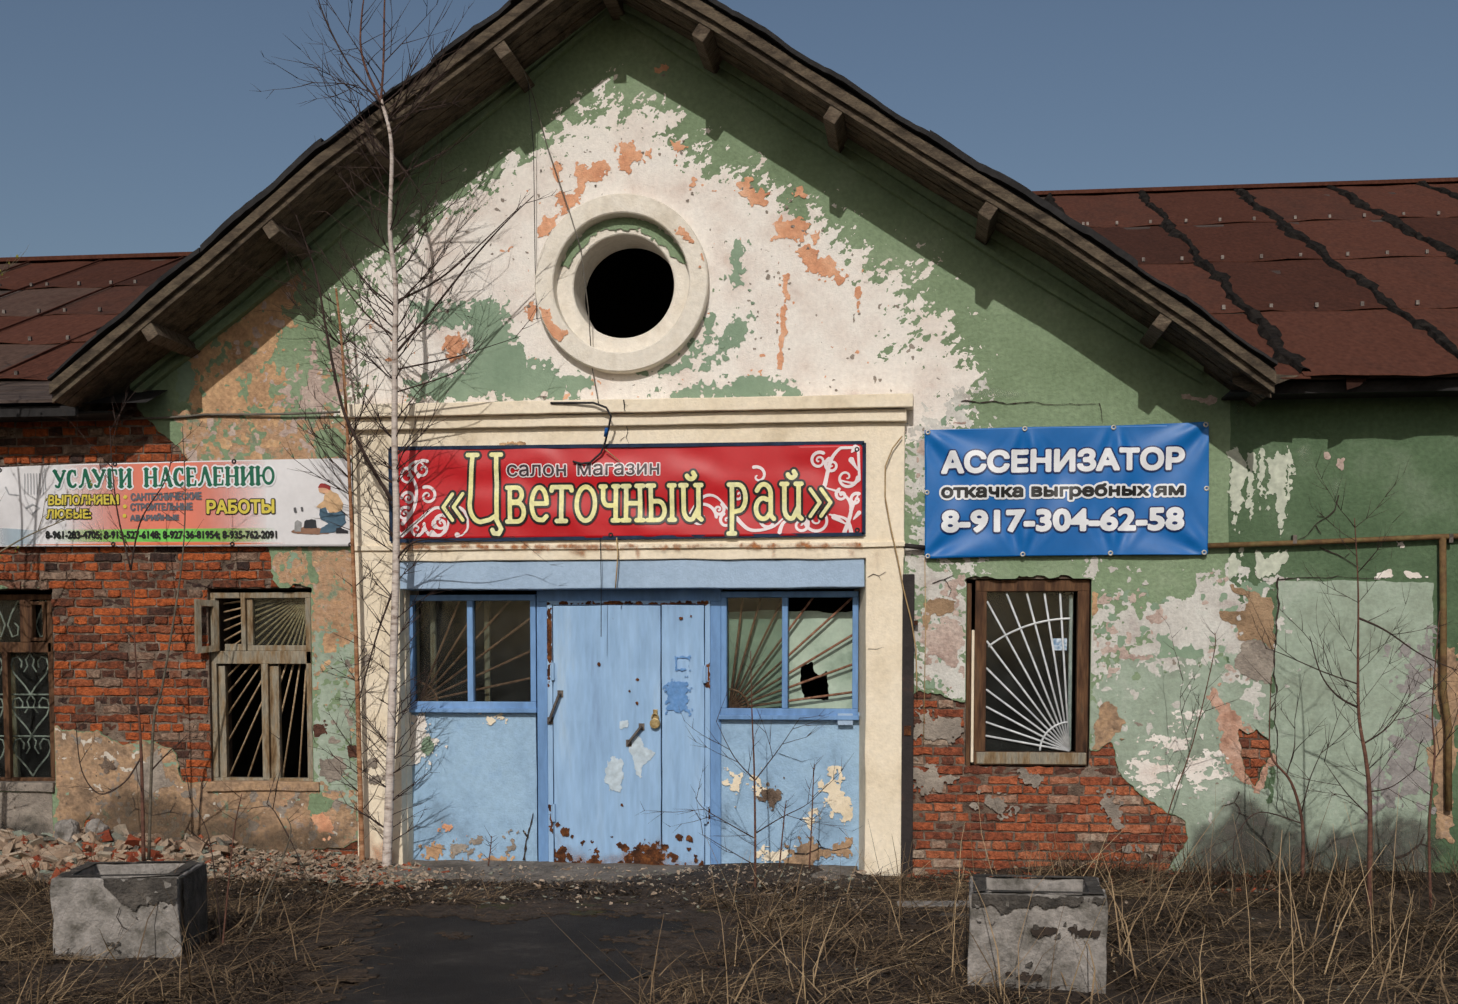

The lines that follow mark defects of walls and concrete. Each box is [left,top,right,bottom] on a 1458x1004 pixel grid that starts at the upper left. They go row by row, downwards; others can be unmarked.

peeling [164,63,998,722]
peeling [0,546,385,854]
peeling [1071,555,1458,874]
rust [548,804,704,866]
spalling [722,767,785,811]
spalling [756,765,853,865]
spalling [57,860,209,956]
spalling [966,874,1106,967]
spalling [1005,961,1043,982]